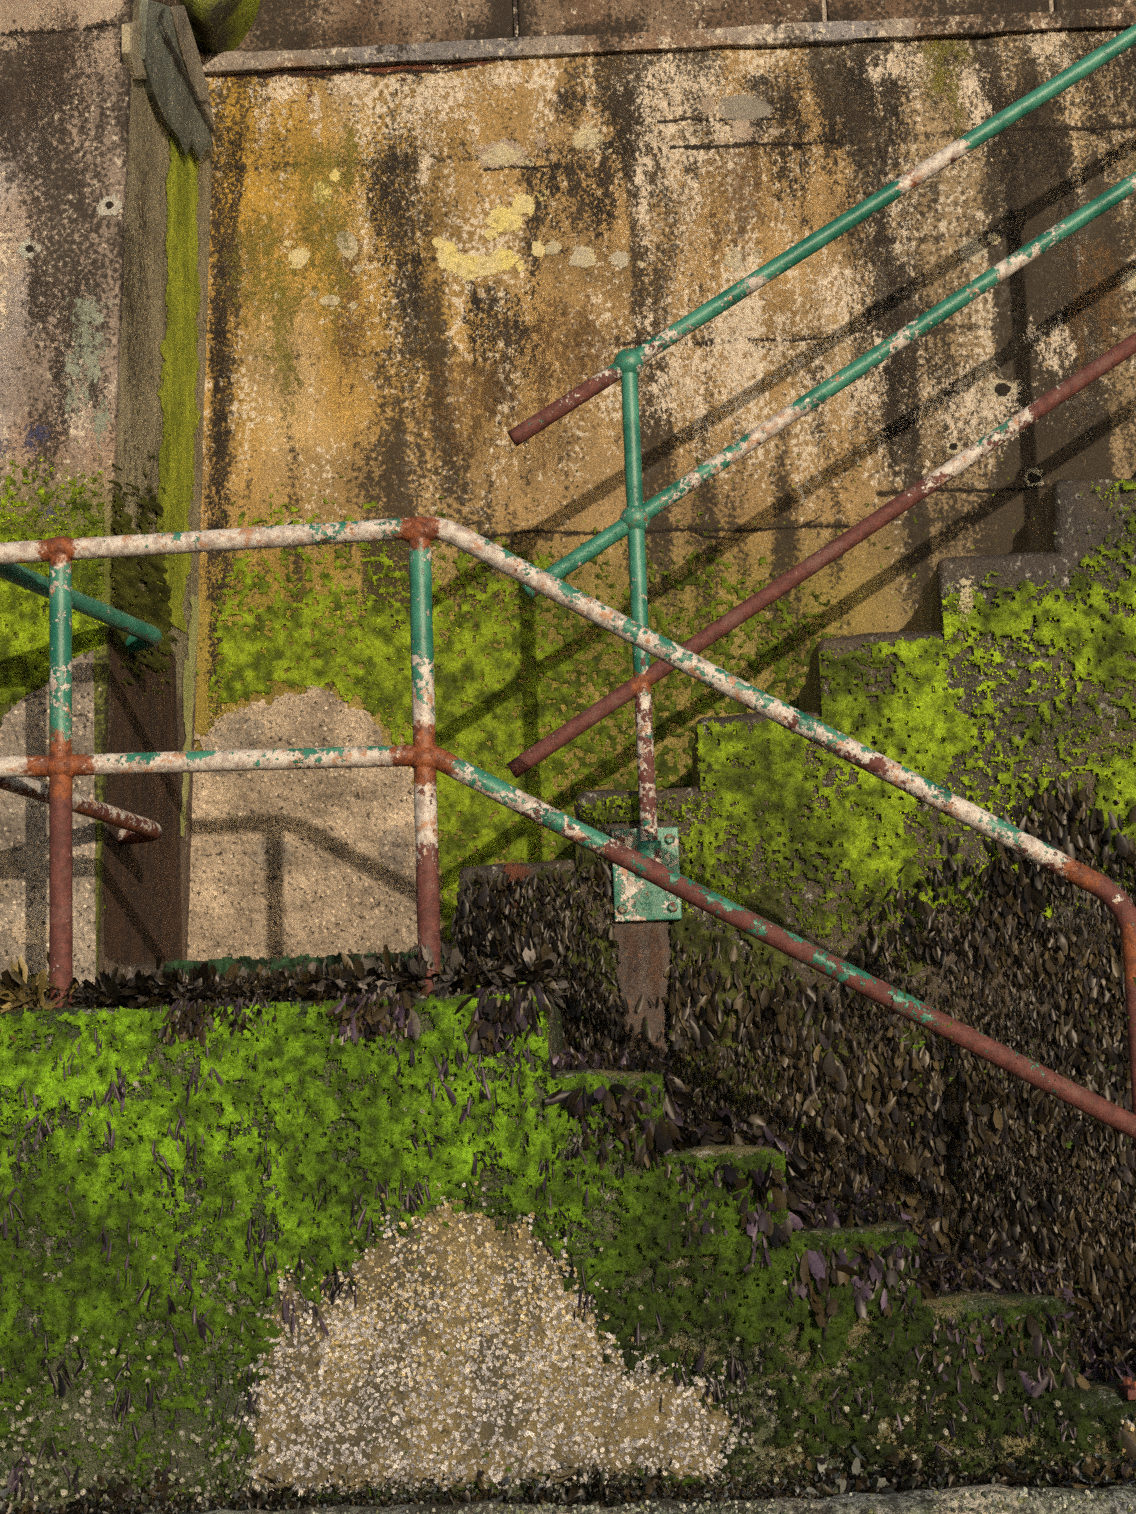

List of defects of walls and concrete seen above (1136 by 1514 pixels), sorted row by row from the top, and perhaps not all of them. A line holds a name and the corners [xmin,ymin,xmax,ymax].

water stain [945,29,1136,250]
water stain [0,0,182,532]
water stain [202,59,535,530]
water stain [409,47,1088,481]
peeling [0,681,49,757]
peeling [0,789,50,981]
peeling [72,650,94,754]
peeling [72,775,95,800]
peeling [72,812,96,985]
water stain [183,551,235,726]
peeling [194,685,384,751]
peeling [187,766,418,961]